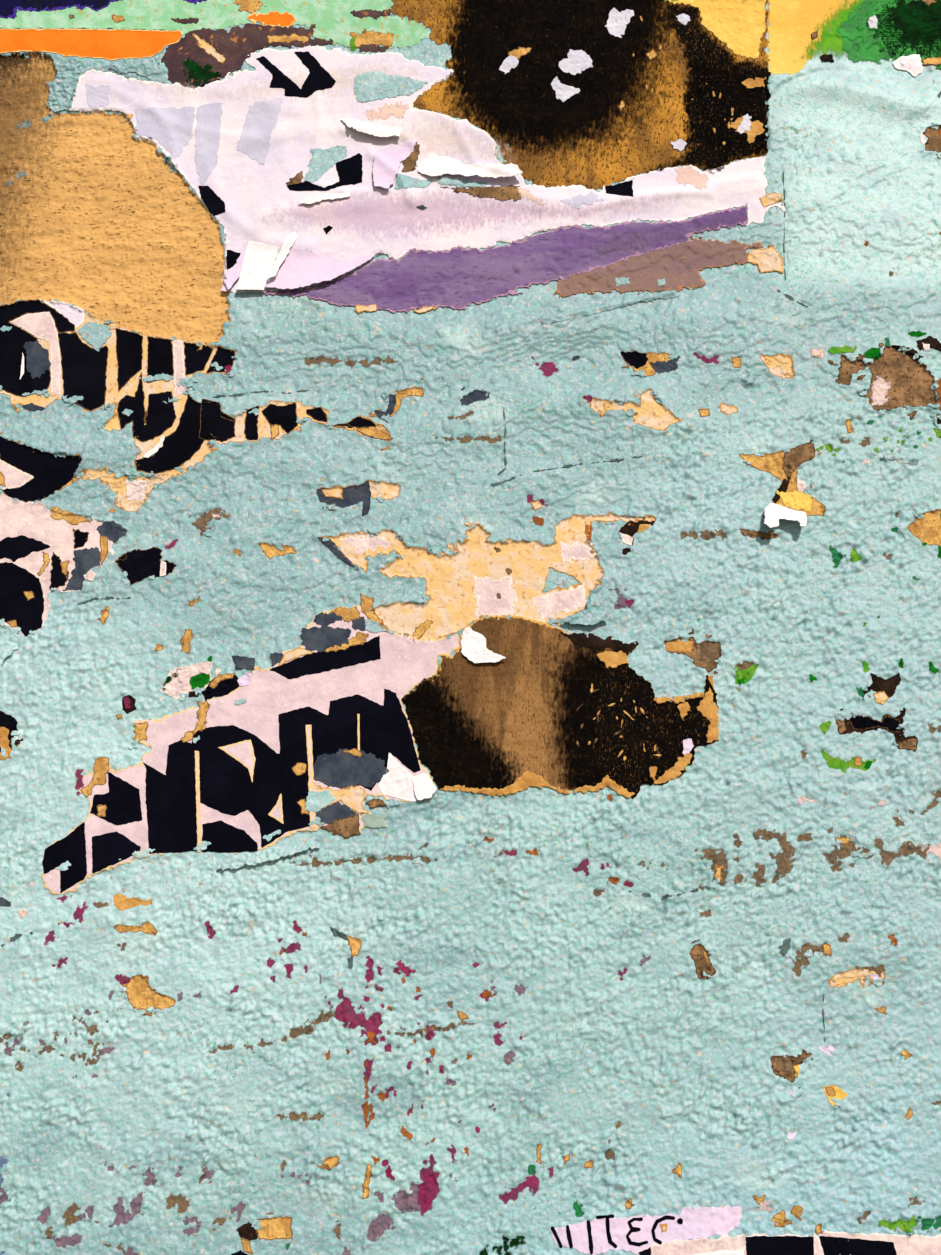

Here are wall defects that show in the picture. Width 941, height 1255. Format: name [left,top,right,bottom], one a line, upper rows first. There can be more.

peeling [0,0,431,53]
spalling [0,52,231,351]
spalling [582,350,741,431]
spalling [811,331,941,438]
peeling [83,464,188,513]
peeling [115,539,178,585]
spalling [316,477,657,644]
peeling [116,695,137,720]
peeling [160,656,222,701]
spalling [664,629,759,689]
peeling [820,658,941,752]
peeling [801,750,876,773]